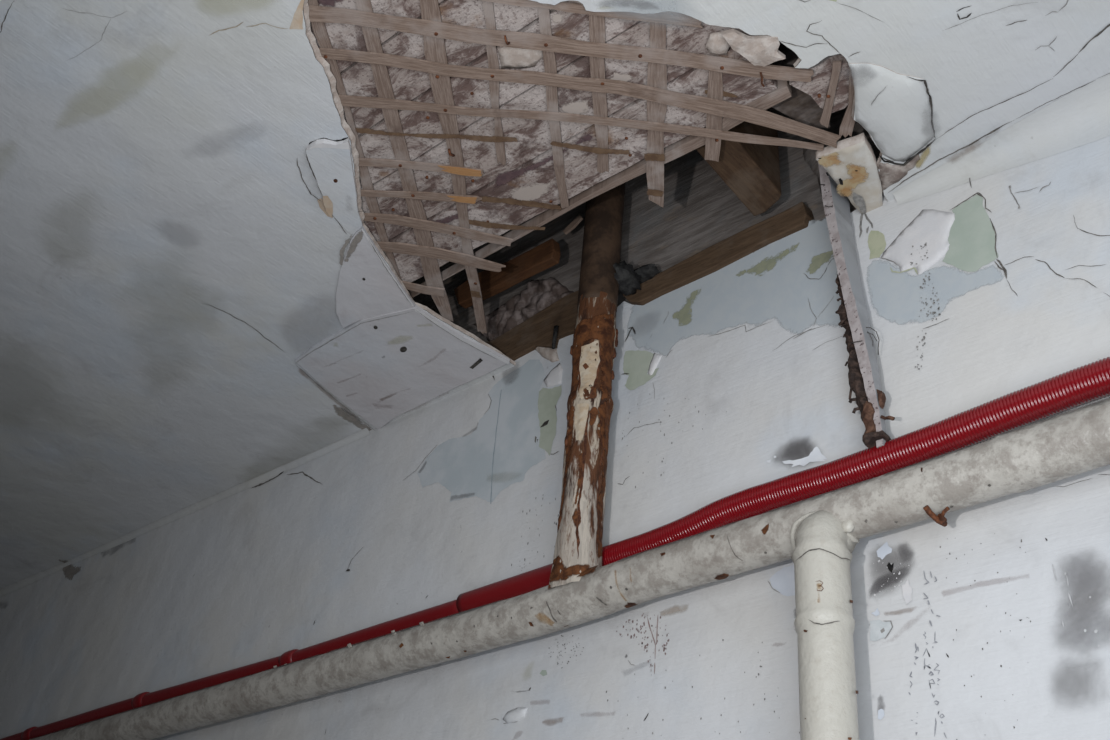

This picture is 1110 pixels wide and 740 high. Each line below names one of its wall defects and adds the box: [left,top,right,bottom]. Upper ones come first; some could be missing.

crack [781,0,859,57]
crack [871,0,1110,193]
peeling [290,0,563,504]
peeling [623,219,841,390]
peeling [867,193,1003,329]
crack [995,256,1109,296]
corrosion [548,314,615,589]